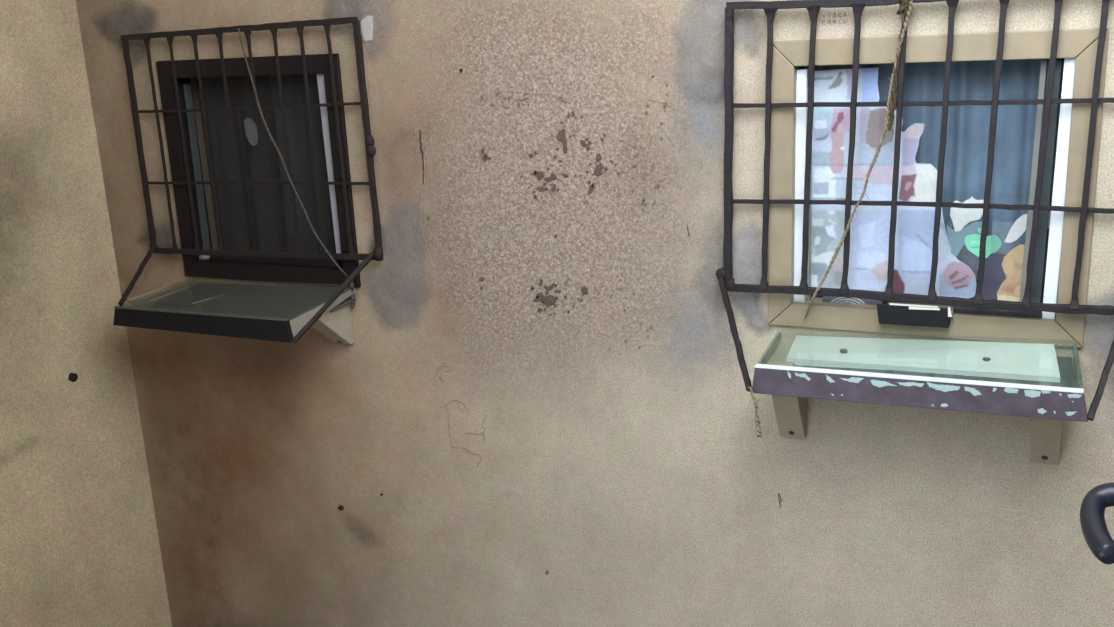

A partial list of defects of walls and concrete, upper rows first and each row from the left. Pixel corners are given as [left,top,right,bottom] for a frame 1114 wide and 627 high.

peeling [420,0,684,363]